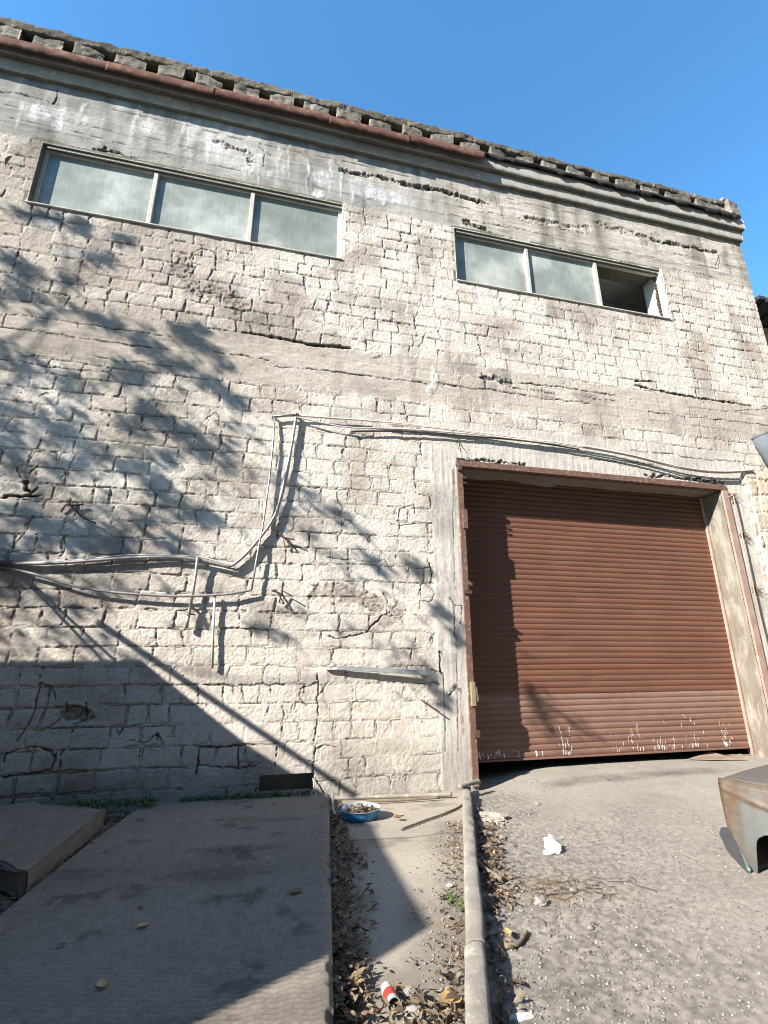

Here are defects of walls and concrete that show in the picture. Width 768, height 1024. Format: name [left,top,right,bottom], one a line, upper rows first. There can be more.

crack [0,89,366,167]
crack [217,352,615,404]
crack [3,682,88,778]